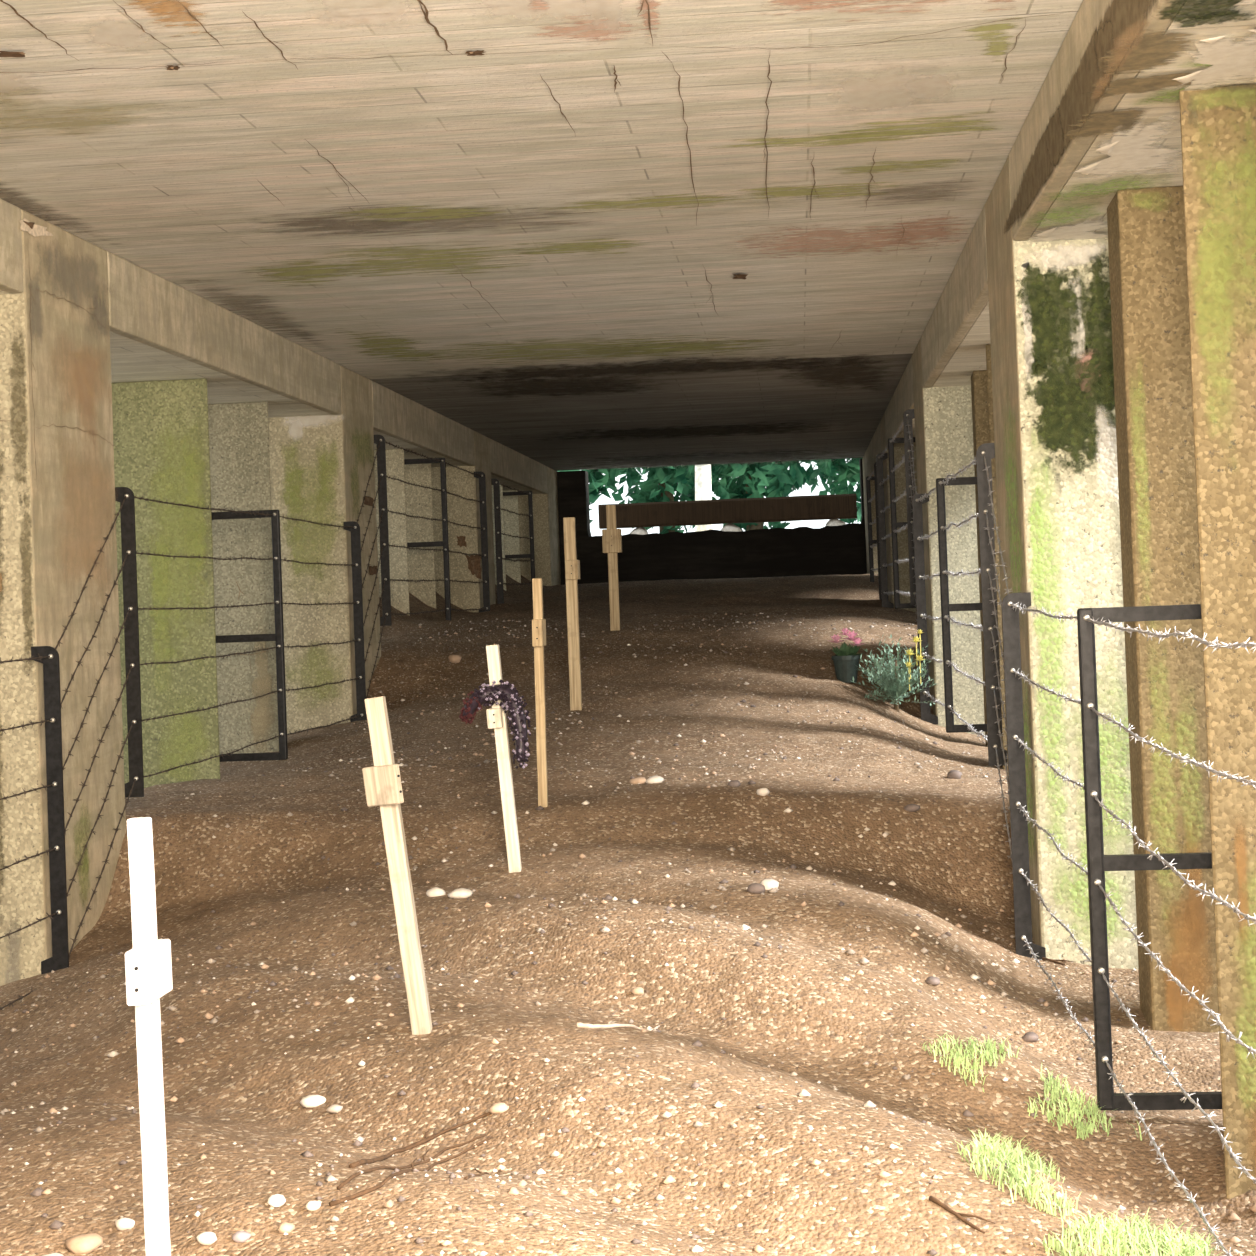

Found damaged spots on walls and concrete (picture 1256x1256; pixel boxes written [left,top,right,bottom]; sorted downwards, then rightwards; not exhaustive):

corrosion [130,0,209,33]
crack [242,0,621,137]
corrosion [539,0,660,40]
crack [637,0,1071,249]
corrosion [775,0,942,14]
water stain [1004,0,1256,233]
water stain [290,206,580,234]
water stain [520,239,637,255]
water stain [456,339,885,397]
water stain [1016,246,1118,497]
water stain [0,291,40,671]
corrosion [1168,869,1208,1032]